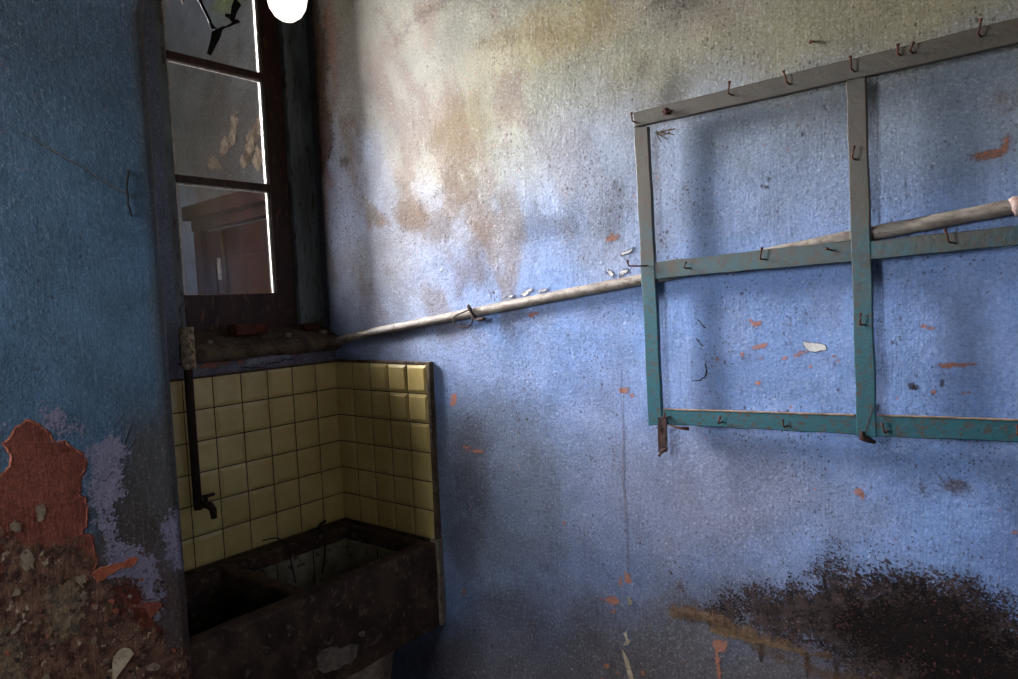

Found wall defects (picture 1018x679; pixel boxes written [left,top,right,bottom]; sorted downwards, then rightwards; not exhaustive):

peeling [781,341,840,363]
spalling [0,400,195,679]
damp [676,537,1018,679]
damp [944,479,970,494]